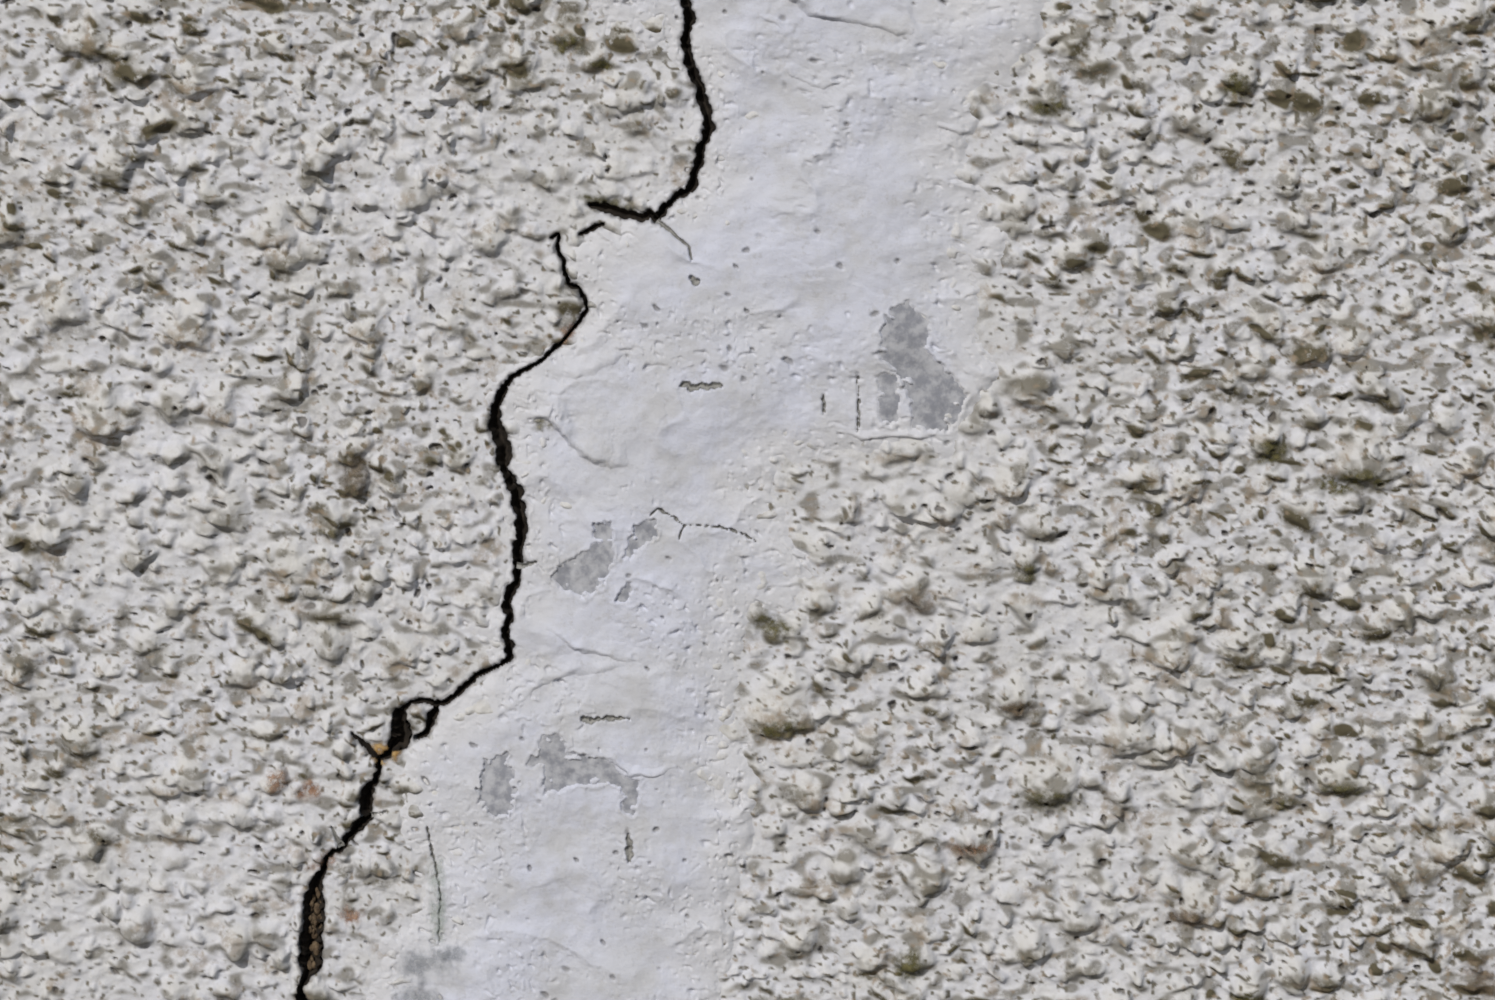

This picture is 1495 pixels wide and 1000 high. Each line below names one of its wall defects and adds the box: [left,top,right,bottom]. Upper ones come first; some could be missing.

spalling [877,300,967,431]
crack [295,0,716,1000]
spalling [552,519,658,595]
spalling [616,582,632,602]
crack [650,508,756,542]